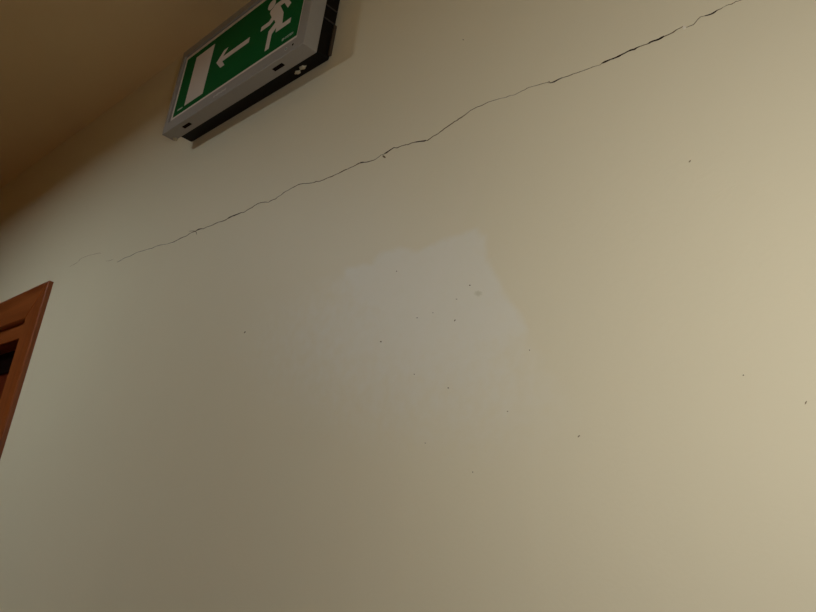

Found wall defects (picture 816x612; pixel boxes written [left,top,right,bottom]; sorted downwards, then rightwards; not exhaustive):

crack [75,0,740,264]